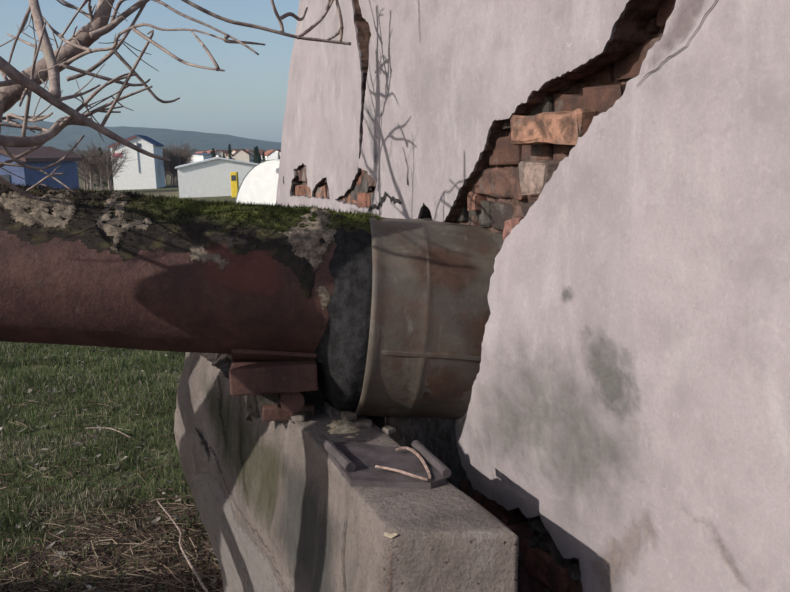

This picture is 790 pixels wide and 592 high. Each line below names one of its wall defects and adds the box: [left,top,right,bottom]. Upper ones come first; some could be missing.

crack [353,0,371,146]
rust [203,247,279,294]
peeling [315,285,331,320]
peeling [279,163,376,272]
leakage [590,346,629,406]
crack [195,427,289,592]
spalling [460,480,583,592]